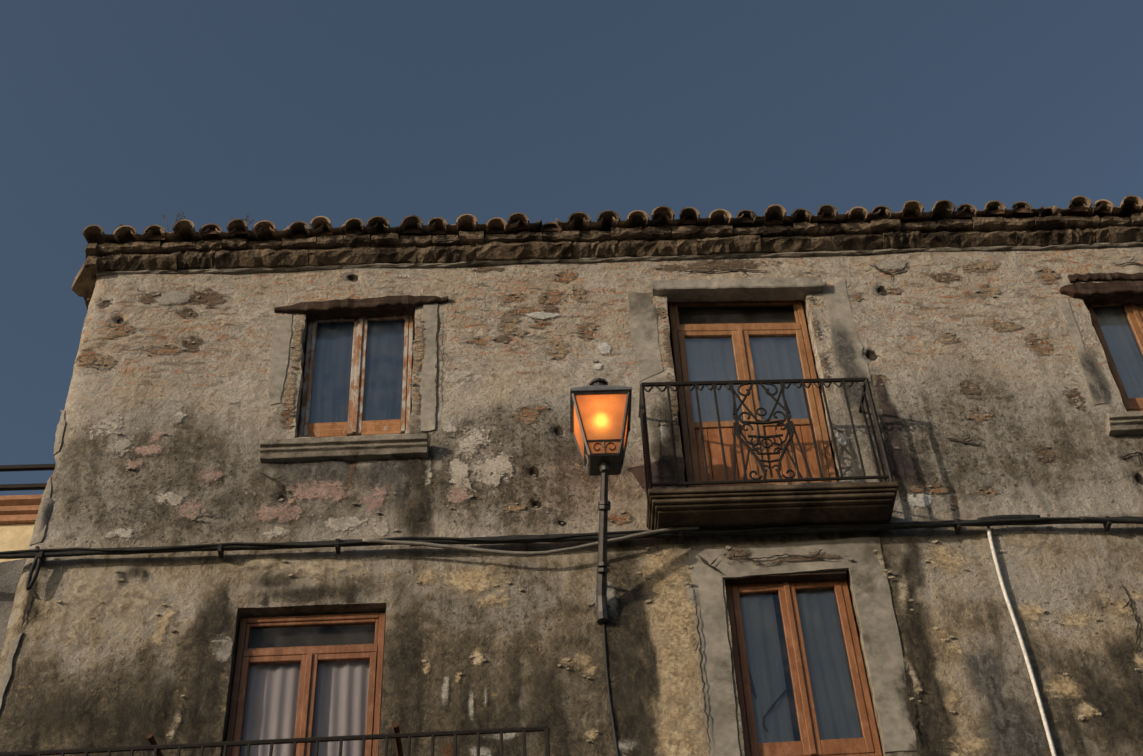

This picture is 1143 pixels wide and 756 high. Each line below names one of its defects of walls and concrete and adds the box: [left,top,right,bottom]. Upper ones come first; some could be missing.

peeling [125,430,167,470]
peeling [177,502,209,522]
peeling [256,481,397,522]
peeling [446,485,474,509]
leakage [832,330,920,483]
leakage [903,541,923,586]
leakage [184,587,230,756]
leakage [605,603,659,756]
leakage [899,603,944,756]
leakage [966,653,1047,756]